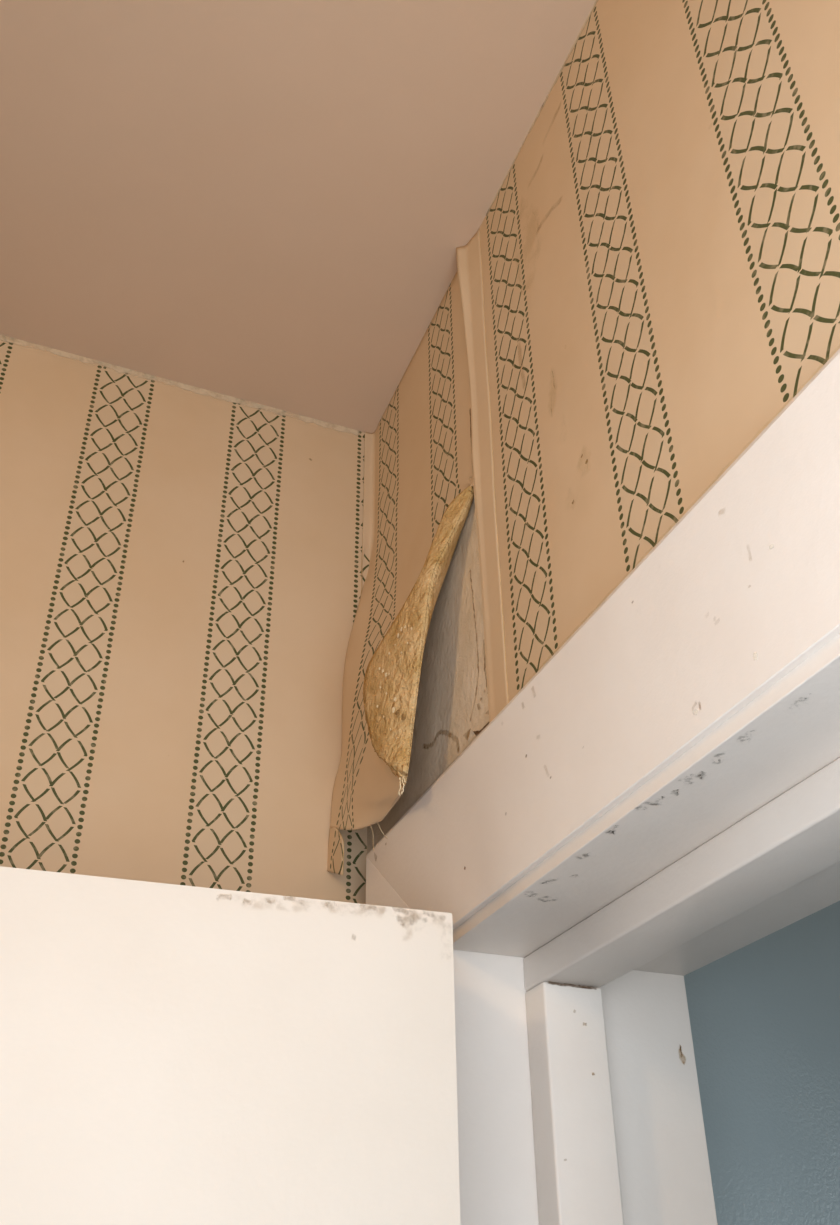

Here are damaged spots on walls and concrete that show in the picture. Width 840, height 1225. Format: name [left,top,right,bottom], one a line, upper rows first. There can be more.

flaking render [367,497,489,852]